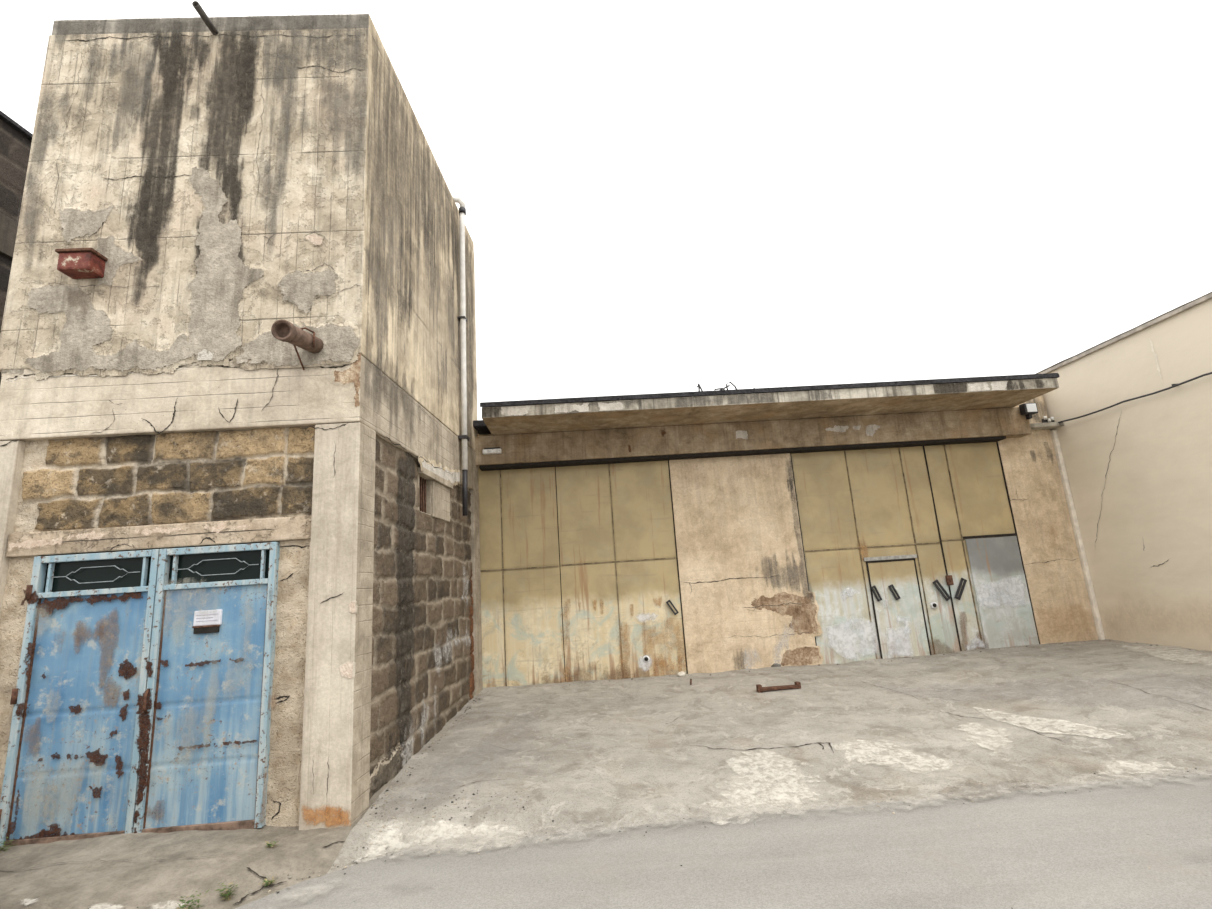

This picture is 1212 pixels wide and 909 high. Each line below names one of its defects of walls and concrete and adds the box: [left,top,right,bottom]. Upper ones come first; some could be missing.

water stain [57,14,501,457]
spalling [1,166,361,414]
corrosion [14,641,46,717]
corrosion [21,589,143,617]
corrosion [185,658,244,667]
spalling [744,591,824,667]
water stain [766,534,812,597]
corrosion [38,658,169,833]
corrosion [178,740,257,751]
corrosion [5,789,76,840]